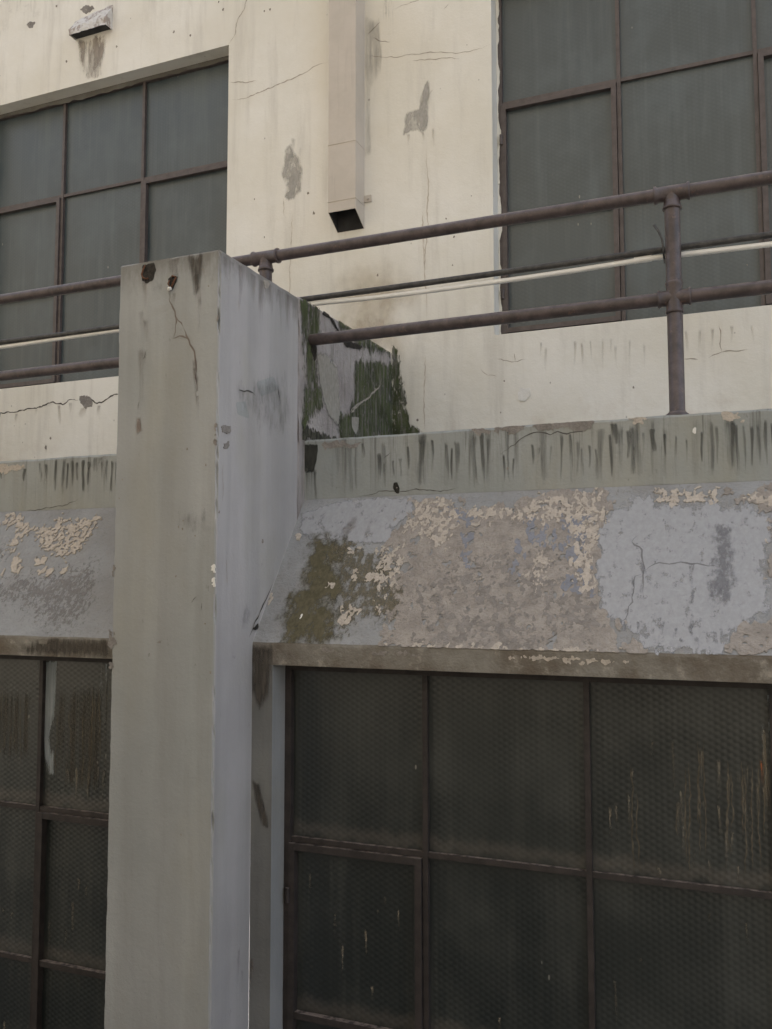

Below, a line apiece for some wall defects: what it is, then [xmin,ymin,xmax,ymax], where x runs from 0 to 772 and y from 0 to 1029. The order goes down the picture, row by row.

damp [79,37,104,77]
crack [366,22,477,61]
spalling [404,82,429,134]
crack [169,294,198,389]
crack [1,394,139,414]
damp [303,425,343,479]
damp [609,424,631,468]
damp [731,422,772,460]
peeling [0,512,102,577]
peeling [653,482,772,580]
peeling [351,487,648,665]
crack [621,535,718,622]